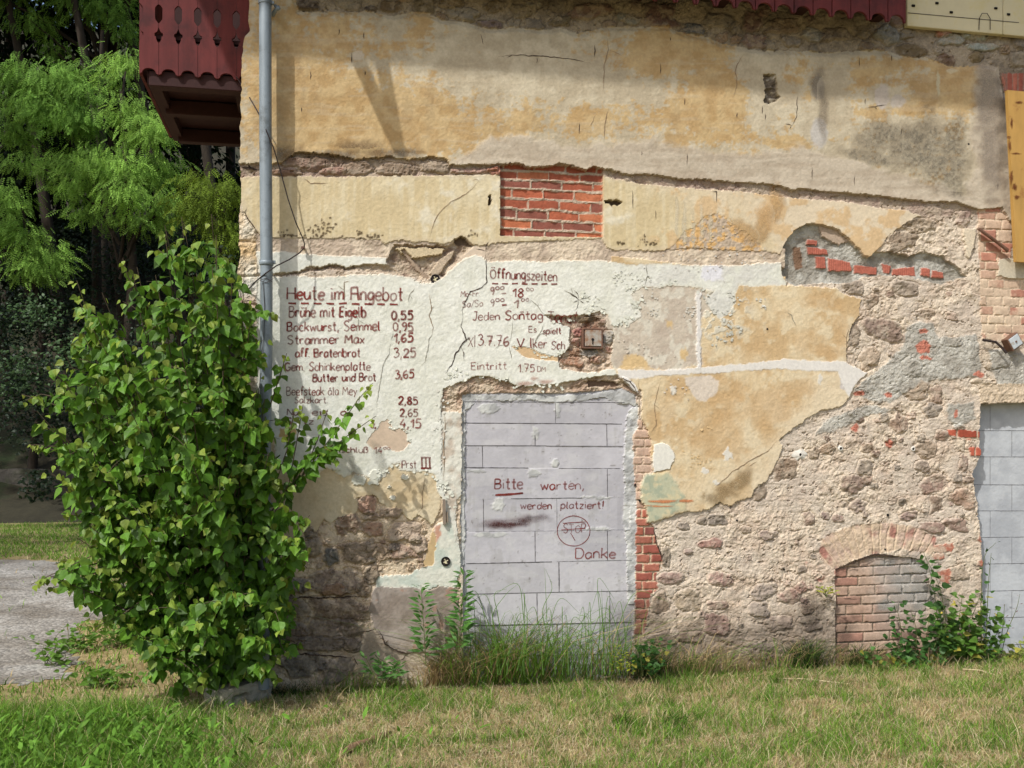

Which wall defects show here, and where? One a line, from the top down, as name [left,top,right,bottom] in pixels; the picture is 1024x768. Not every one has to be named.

flaking render [258,154,500,178]
flaking render [432,267,675,458]
crack [718,444,774,485]
flaking render [602,170,1024,678]
flaking render [270,464,462,693]